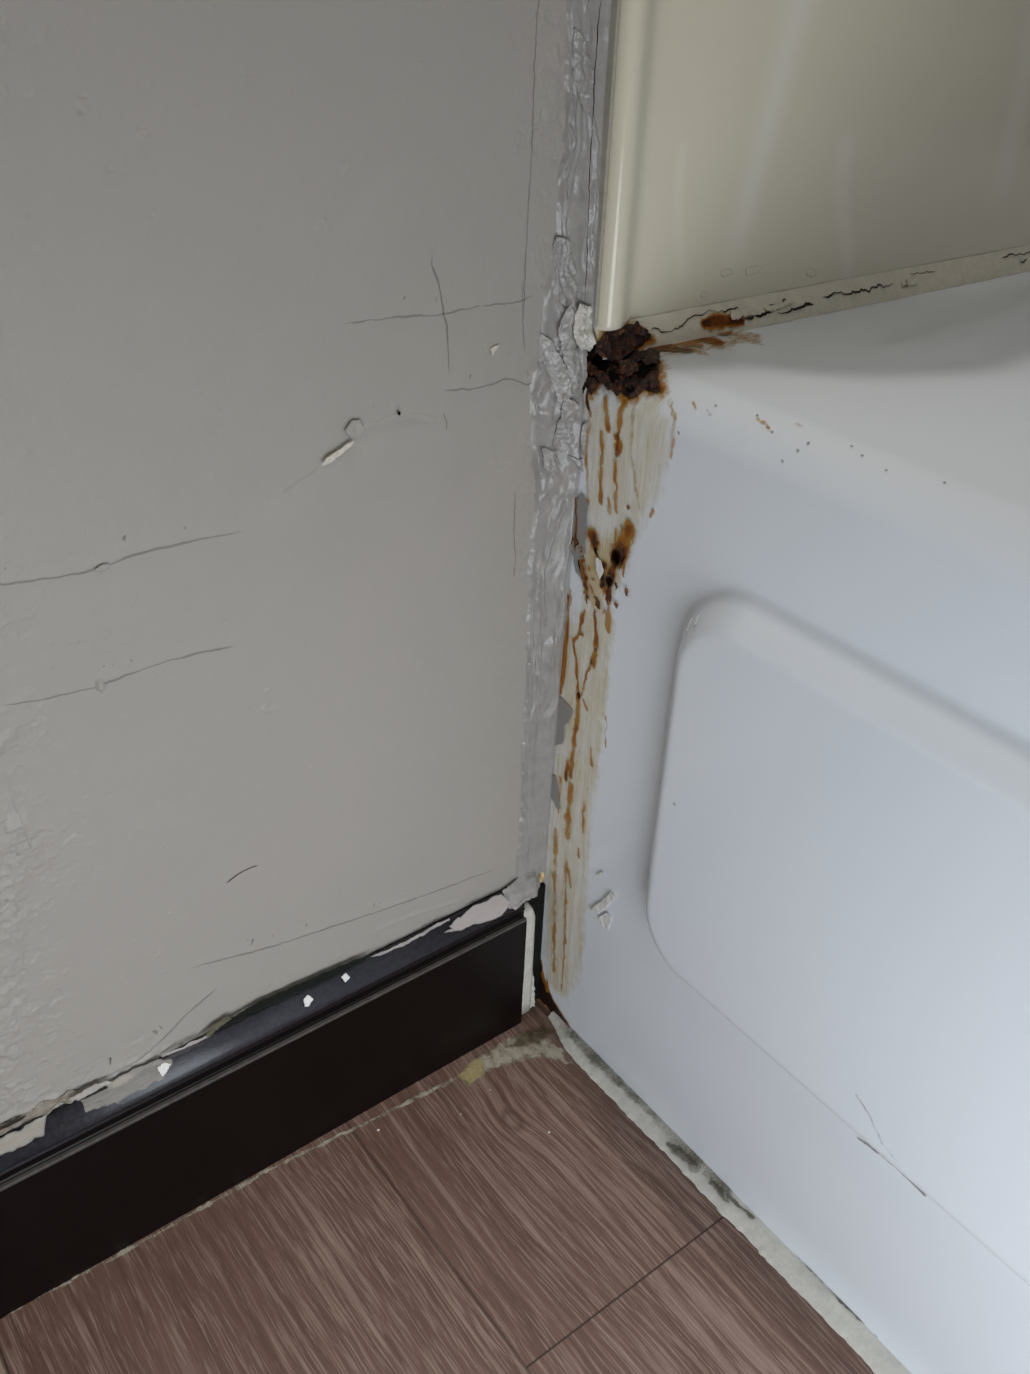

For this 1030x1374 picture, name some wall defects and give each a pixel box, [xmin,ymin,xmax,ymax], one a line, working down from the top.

crack [585,3,601,288]
rust [652,312,758,354]
rust [538,391,638,1027]
peeling [157,1062,171,1076]
peeling [0,1080,113,1136]